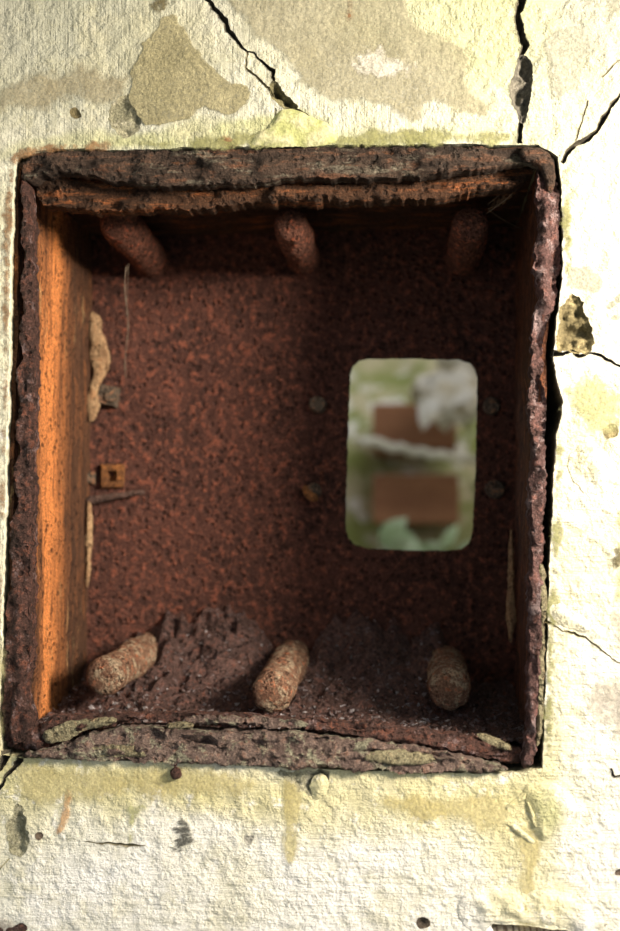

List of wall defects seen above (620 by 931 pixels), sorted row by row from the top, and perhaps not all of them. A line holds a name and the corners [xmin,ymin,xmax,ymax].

peeling [108,14,250,138]
crack [205,0,309,116]
damp [230,0,486,121]
crack [514,0,530,58]
crack [561,93,620,164]
corrosion [2,144,74,331]
spalling [556,266,604,355]
crack [550,349,620,367]
crack [0,749,25,790]
damp [22,767,252,800]
damp [170,820,195,852]
damp [285,783,300,861]